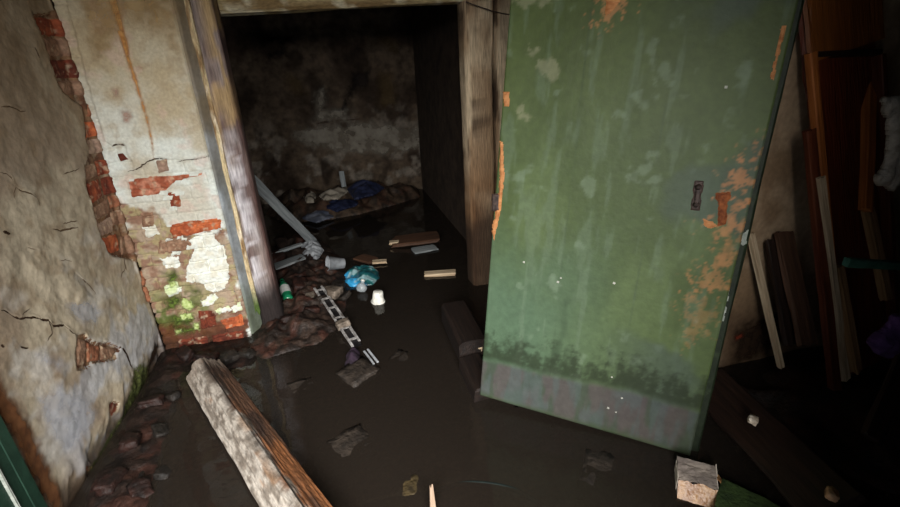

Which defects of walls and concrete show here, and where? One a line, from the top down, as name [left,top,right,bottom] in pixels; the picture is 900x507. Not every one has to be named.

rust [110,0,152,138]
spalling [32,9,151,303]
peeling [128,159,202,211]
crack [128,157,206,172]
peeling [140,212,244,348]
crack [0,306,77,340]
spalling [75,331,120,374]